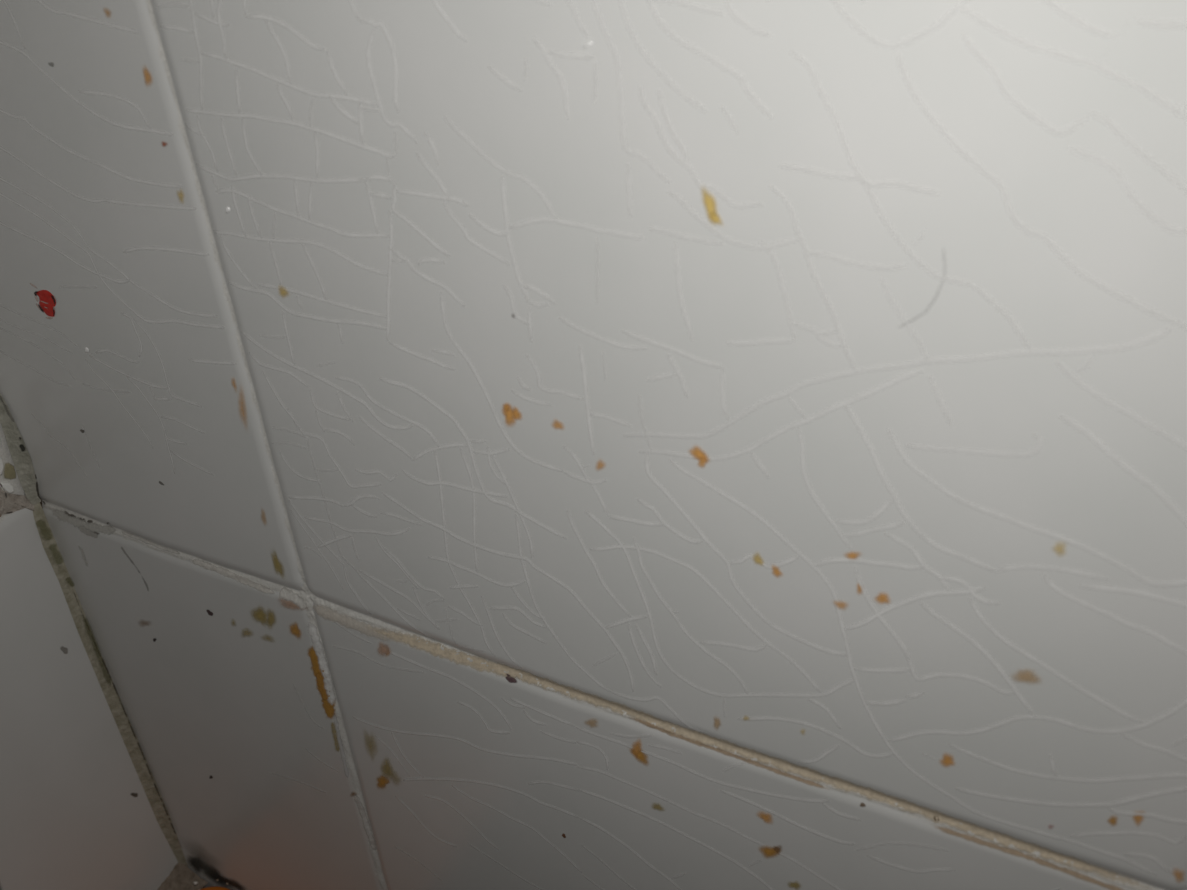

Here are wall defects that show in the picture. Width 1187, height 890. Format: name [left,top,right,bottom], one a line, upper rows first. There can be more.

rust [504,405,520,424]
rust [692,448,707,466]
spalling [0,457,37,515]
crack [35,474,109,534]
rust [253,609,275,626]
rust [308,647,335,718]
rust [633,743,647,763]
rust [762,847,780,857]